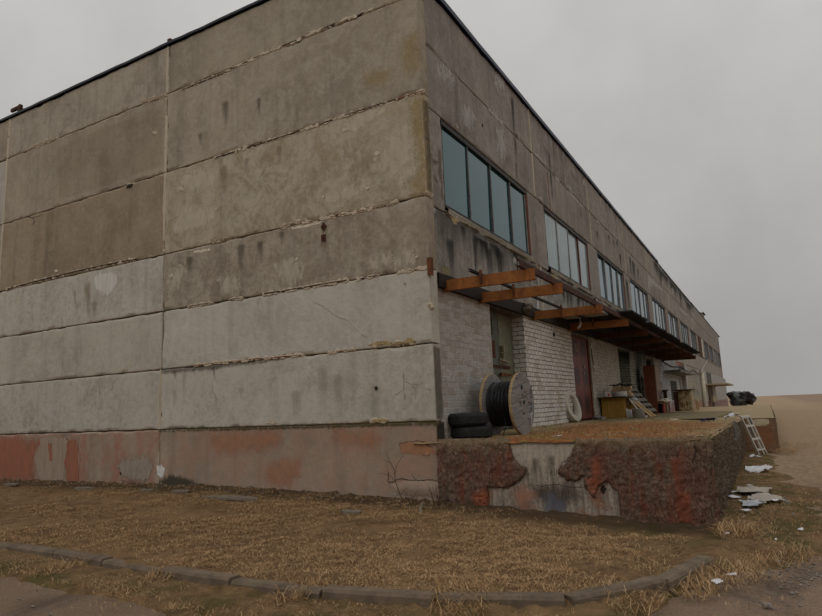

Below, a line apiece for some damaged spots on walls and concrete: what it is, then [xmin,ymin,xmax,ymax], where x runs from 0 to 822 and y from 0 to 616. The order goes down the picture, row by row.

peeling [341,107,385,132]
peeling [34,436,78,481]
spalling [488,443,621,517]